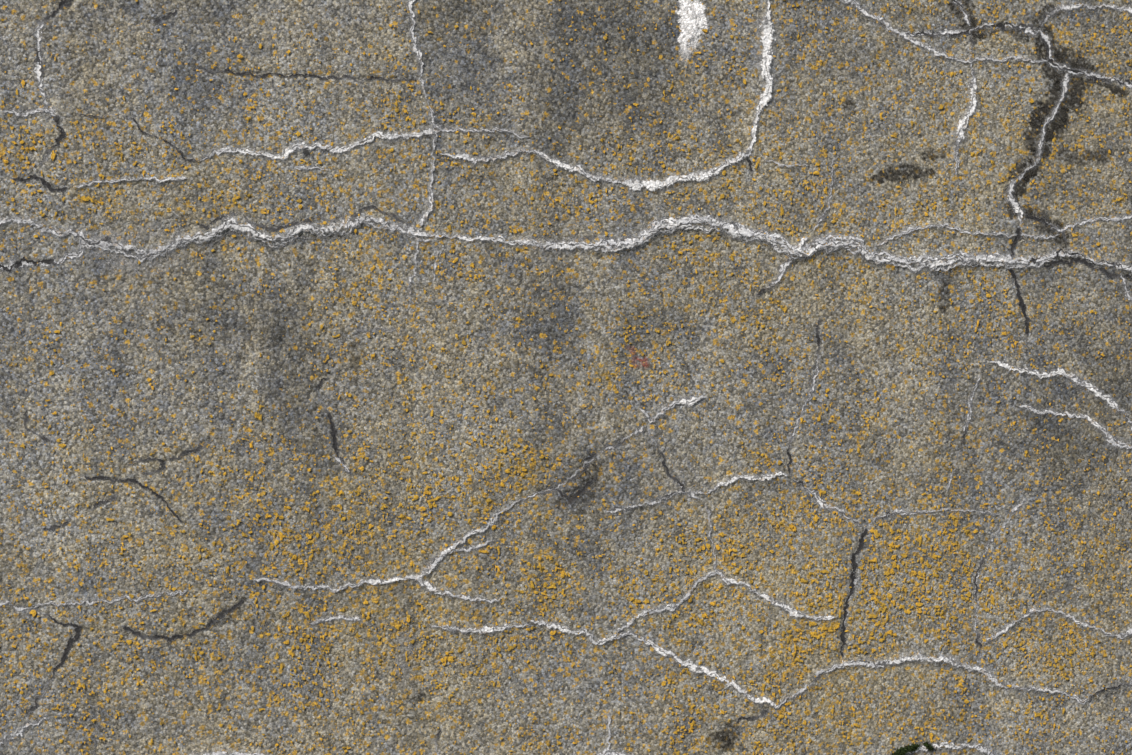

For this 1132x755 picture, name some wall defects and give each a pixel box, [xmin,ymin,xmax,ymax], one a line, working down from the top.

crack [0,0,1132,336]
damp [949,0,1127,250]
crack [0,318,1132,744]
crack [203,747,264,755]
crack [595,714,625,755]
crack [906,742,1001,755]